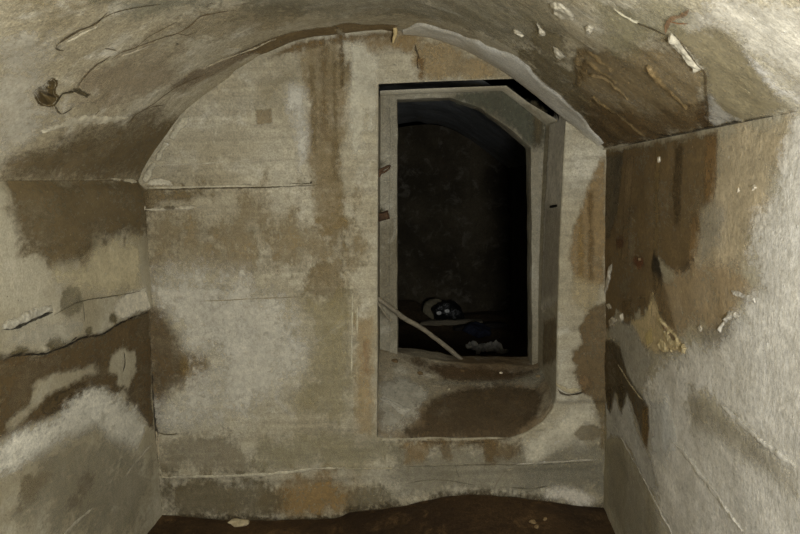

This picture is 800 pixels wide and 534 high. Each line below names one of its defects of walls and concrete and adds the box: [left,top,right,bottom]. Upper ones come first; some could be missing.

crack [55,4,234,122]
leakage [236,23,395,199]
peeling [550,2,574,21]
flaking render [668,34,702,73]
leakage [3,109,213,270]
leakage [570,26,793,490]
crack [4,291,147,358]
leakage [0,192,365,473]
flaking render [717,311,741,333]
crack [152,375,179,446]
leakage [404,357,542,461]